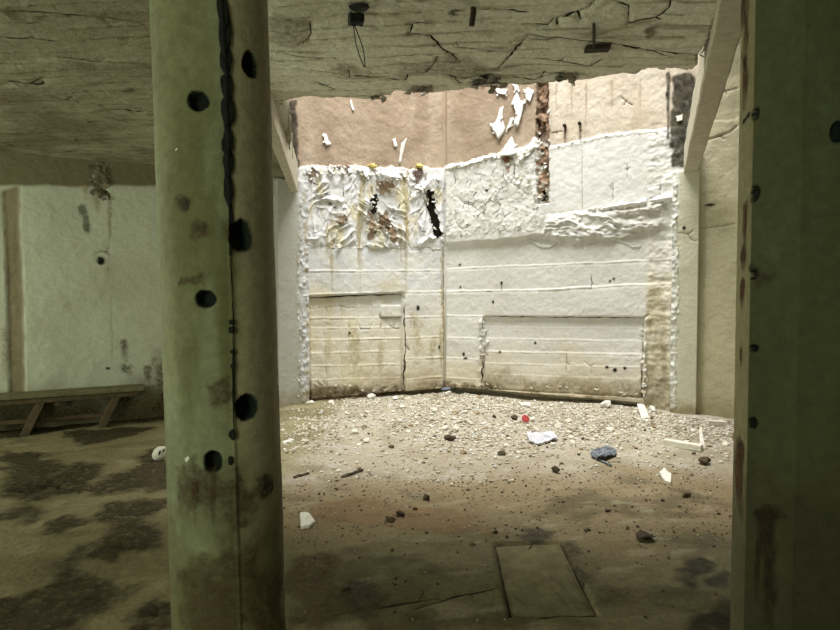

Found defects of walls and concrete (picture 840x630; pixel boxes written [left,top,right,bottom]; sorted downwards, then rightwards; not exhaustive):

crack [277,0,706,90]
leakage [79,205,89,231]
peeling [297,73,667,401]
crack [309,294,409,390]
crack [480,316,646,387]